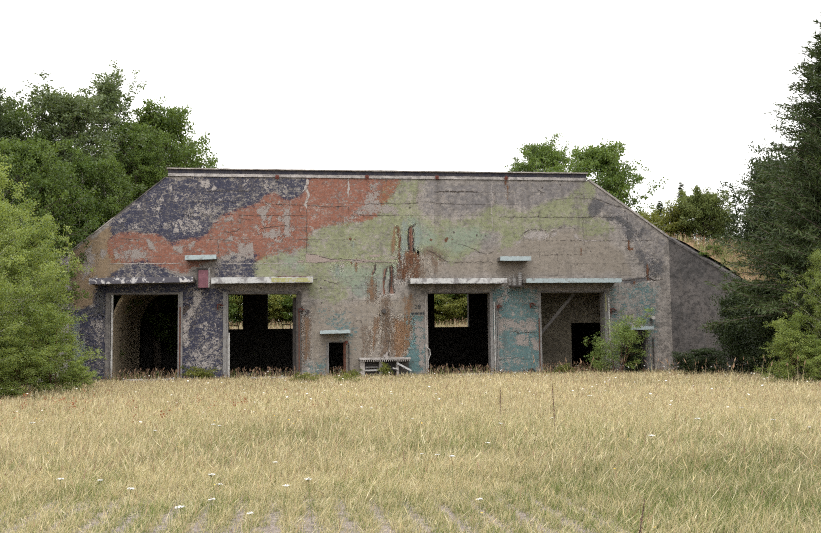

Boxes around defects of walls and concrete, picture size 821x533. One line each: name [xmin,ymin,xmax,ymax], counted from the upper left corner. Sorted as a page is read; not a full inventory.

peeling [183,290,221,373]
peeling [221,200,295,263]
crack [190,190,487,328]
corrosion [362,227,423,357]
peeling [493,286,539,364]
crack [504,190,651,274]